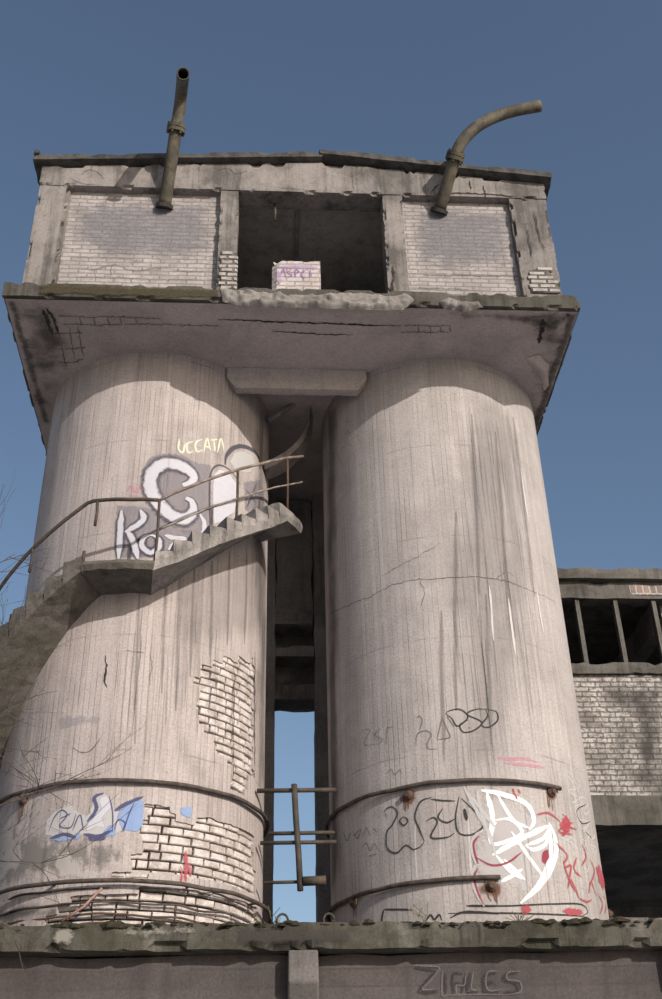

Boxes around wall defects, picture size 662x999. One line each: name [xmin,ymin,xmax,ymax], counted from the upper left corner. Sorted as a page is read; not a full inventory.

spalling [527,267,560,293]
spalling [54,316,219,365]
crack [333,543,556,612]
damp [475,574,494,641]
crack [103,650,153,688]
spalling [193,657,255,793]
spalling [0,804,255,926]
rust [481,880,500,905]